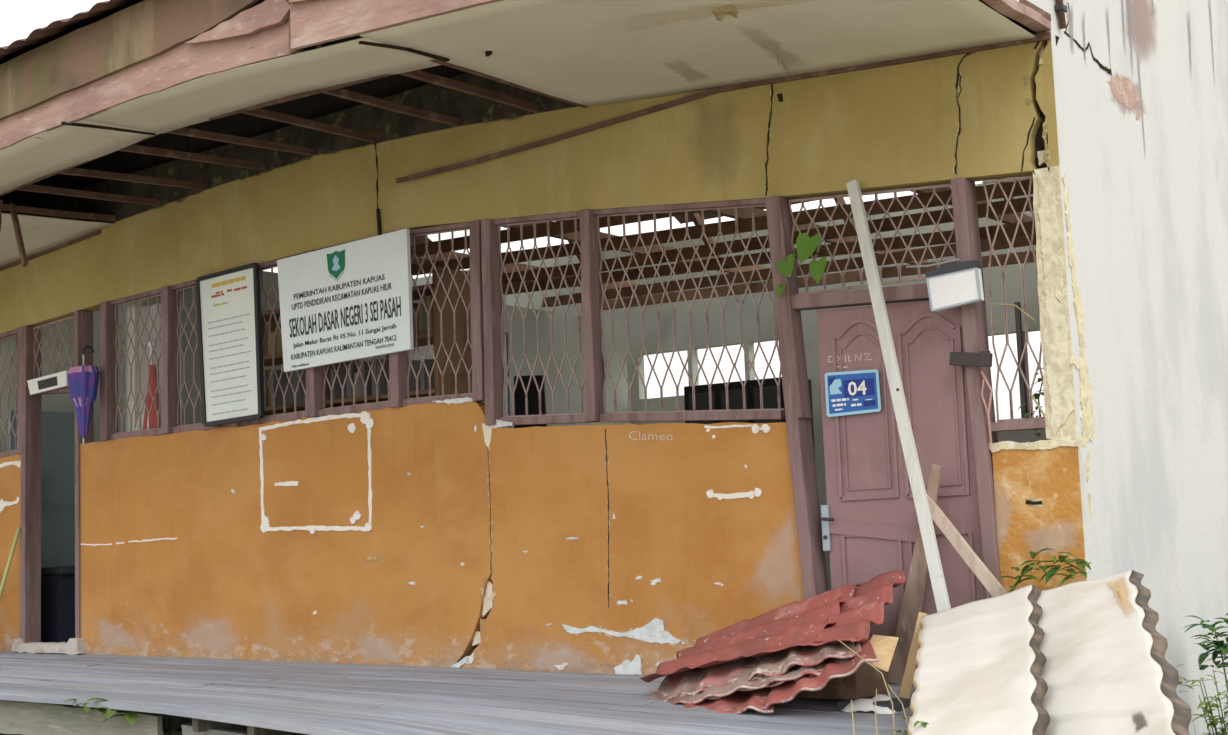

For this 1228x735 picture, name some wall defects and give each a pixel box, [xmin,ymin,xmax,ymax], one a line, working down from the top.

crack [374,144,382,217]
crack [764,84,783,195]
crack [952,52,976,175]
crack [1021,2,1112,172]
spalling [1107,75,1141,120]
flaking render [989,174,1095,517]
crack [451,423,496,668]
crack [604,429,612,607]
peeling [546,617,686,675]